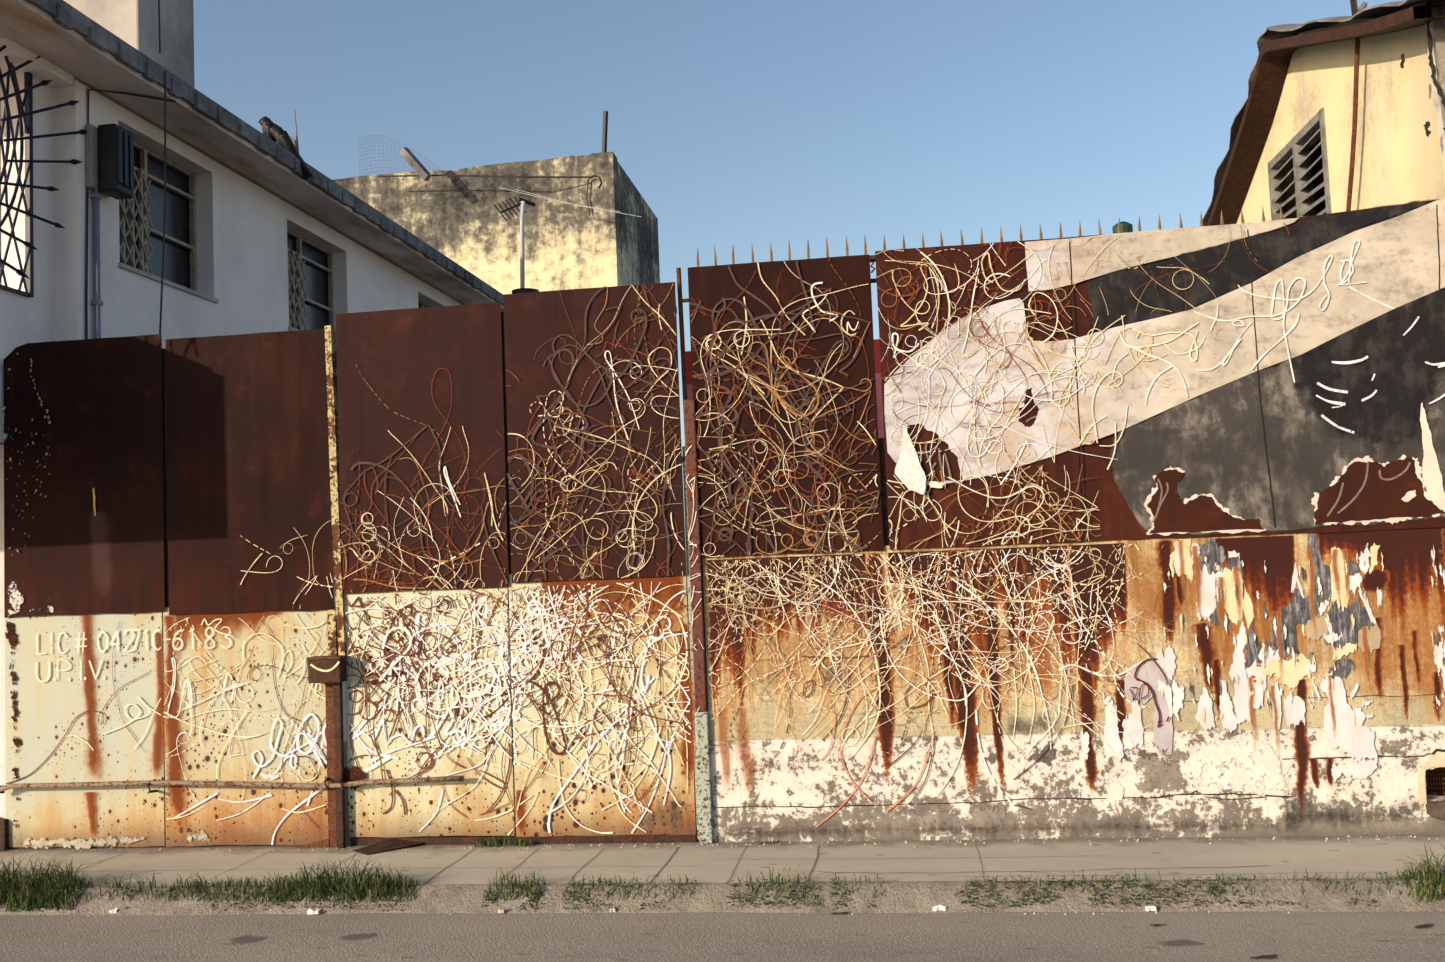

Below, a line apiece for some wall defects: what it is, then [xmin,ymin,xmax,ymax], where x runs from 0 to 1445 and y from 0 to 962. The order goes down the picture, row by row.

peeling [1147,469,1264,534]
peeling [1314,457,1445,525]
corrosion [81,614,100,775]
corrosion [358,669,404,685]
corrosion [541,576,695,782]
corrosion [706,527,1445,812]
corrosion [344,766,366,787]
spalling [1378,734,1412,755]
corrosion [85,792,96,835]
corrosion [515,790,525,832]